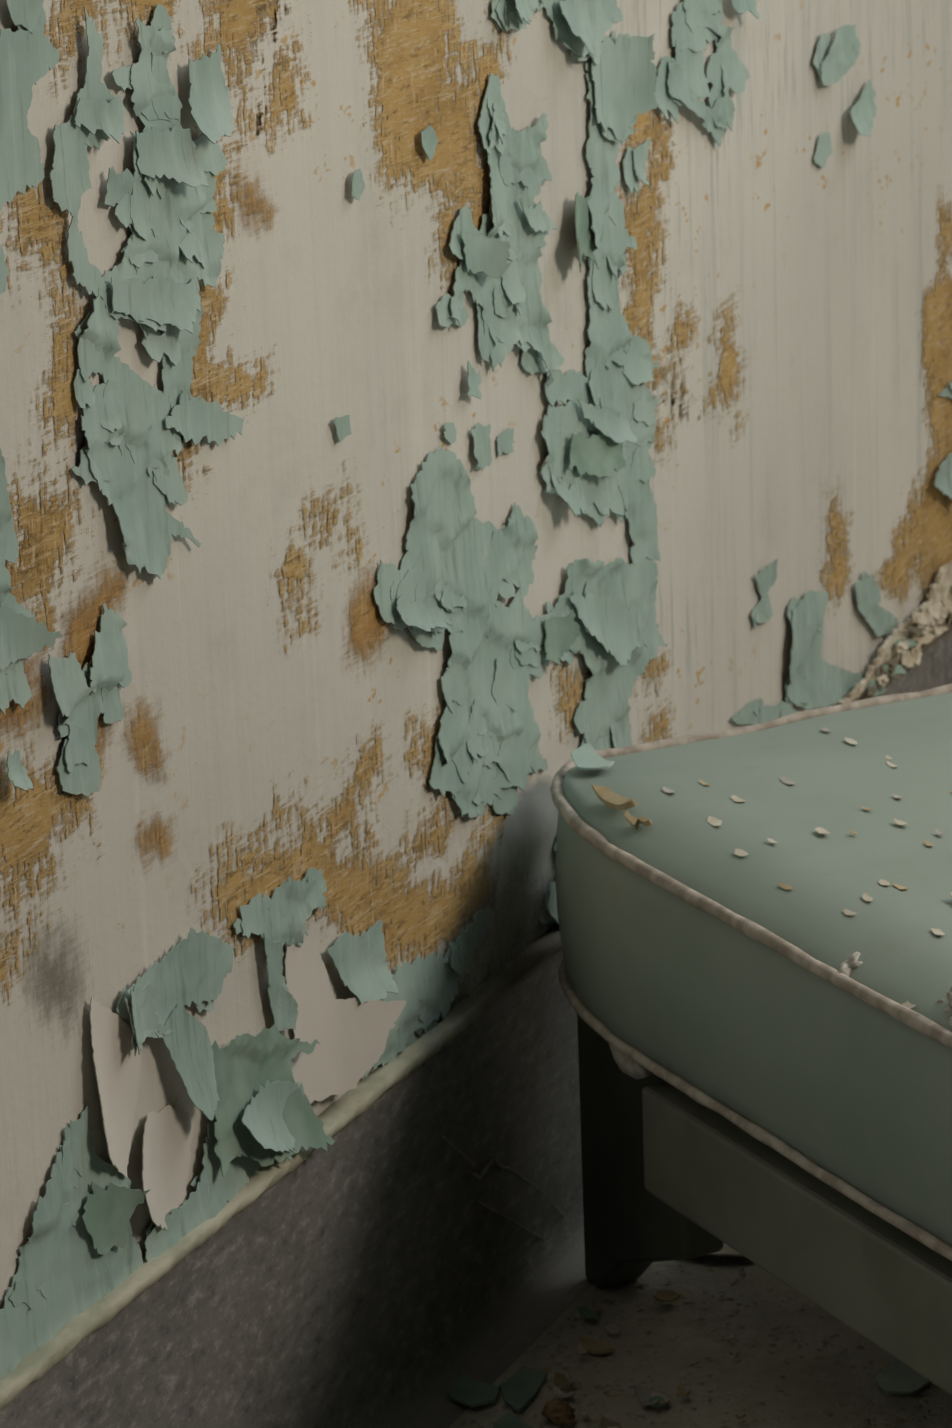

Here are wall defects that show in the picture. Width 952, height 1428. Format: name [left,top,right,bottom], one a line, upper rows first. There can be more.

peeling [813,24,861,86]
peeling [850,79,877,136]
peeling [0,0,761,1380]
peeling [732,185,952,725]